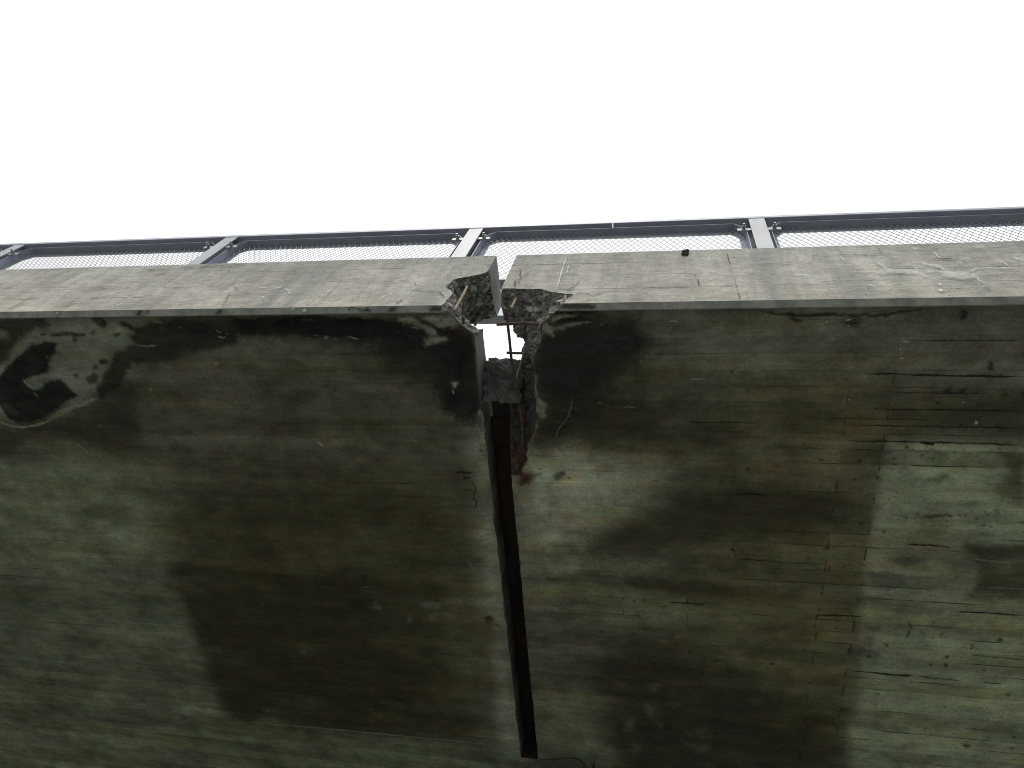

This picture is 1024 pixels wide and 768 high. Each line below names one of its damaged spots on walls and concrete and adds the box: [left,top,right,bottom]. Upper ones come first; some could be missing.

water stain [0,306,479,428]
spalling [442,267,573,475]
water stain [534,304,646,437]
water stain [771,311,909,326]
crack [848,373,1024,446]
crack [912,336,1014,344]